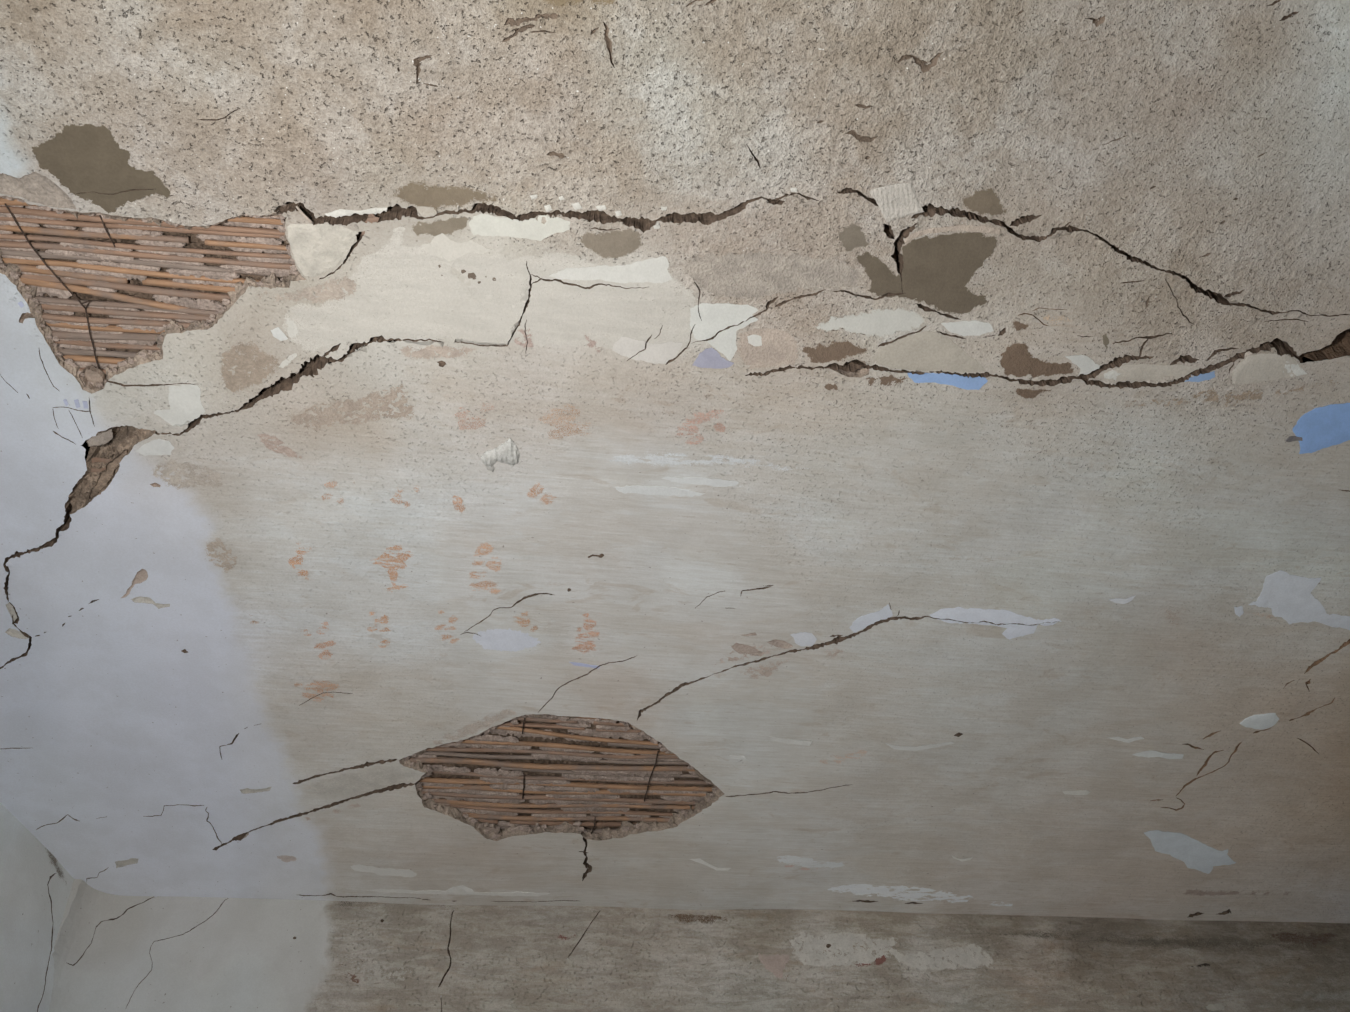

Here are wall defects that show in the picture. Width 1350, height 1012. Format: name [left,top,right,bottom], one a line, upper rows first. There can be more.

peeling [0,171,290,244]
flaking render [0,249,358,394]
crack [275,144,1350,389]
crack [637,603,1054,720]
crack [144,759,414,850]
flaking render [311,725,724,841]
peeling [1144,830,1236,874]
crack [1151,639,1350,811]
crack [300,893,455,1012]